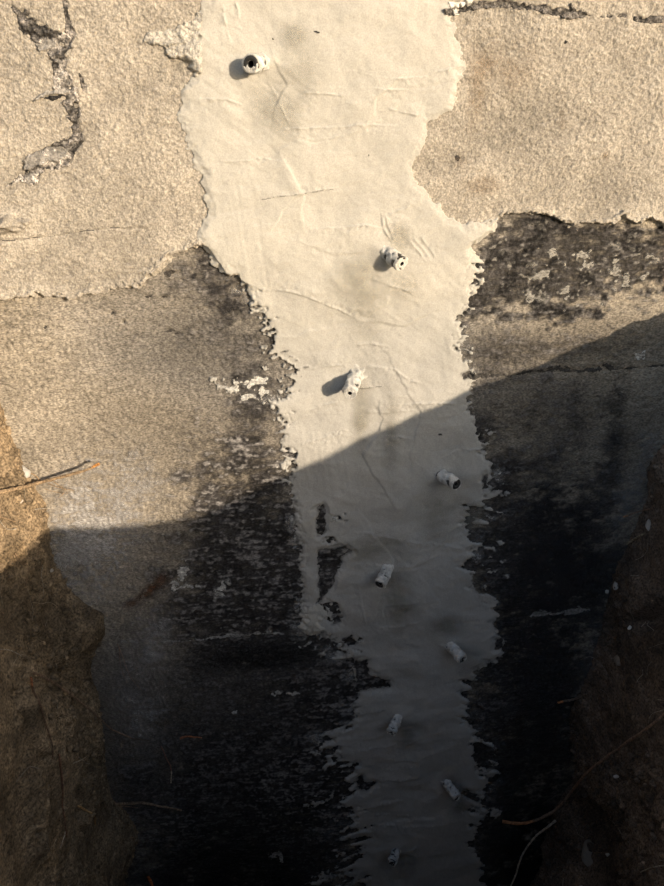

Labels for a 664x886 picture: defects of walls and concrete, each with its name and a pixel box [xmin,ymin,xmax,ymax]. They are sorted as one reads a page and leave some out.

crack [443,0,664,24]
spalling [497,206,664,315]
efflorescence [50,477,145,595]
leakage [530,606,590,617]
leakage [121,622,284,669]